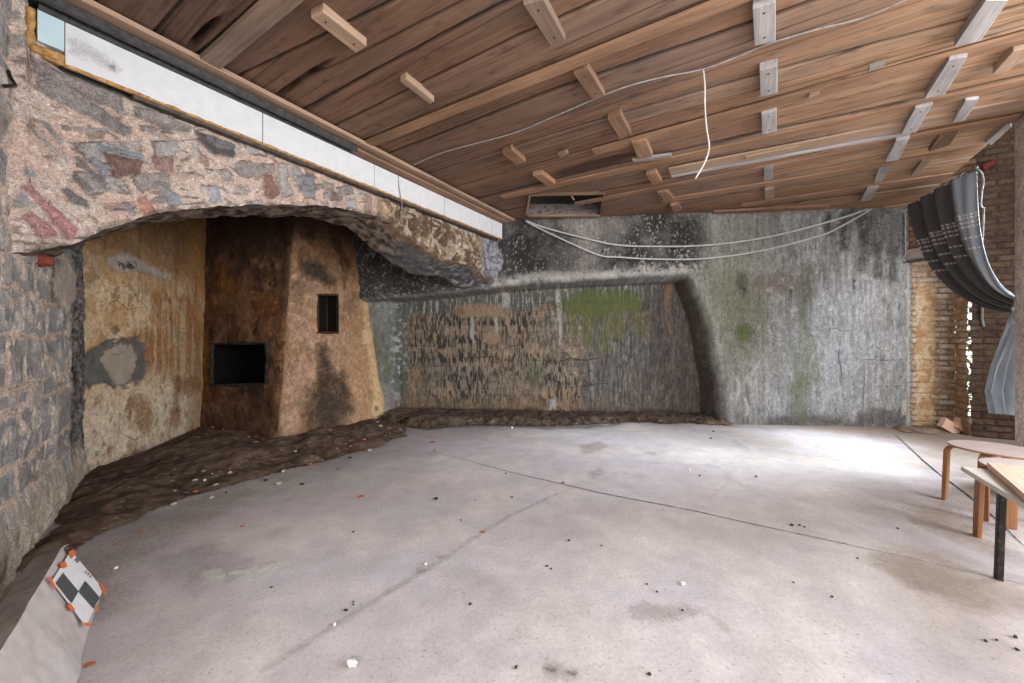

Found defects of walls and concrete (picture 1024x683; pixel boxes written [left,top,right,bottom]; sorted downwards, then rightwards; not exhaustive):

damp [823,211,897,282]
damp [518,268,694,349]
flaking render [82,335,148,389]